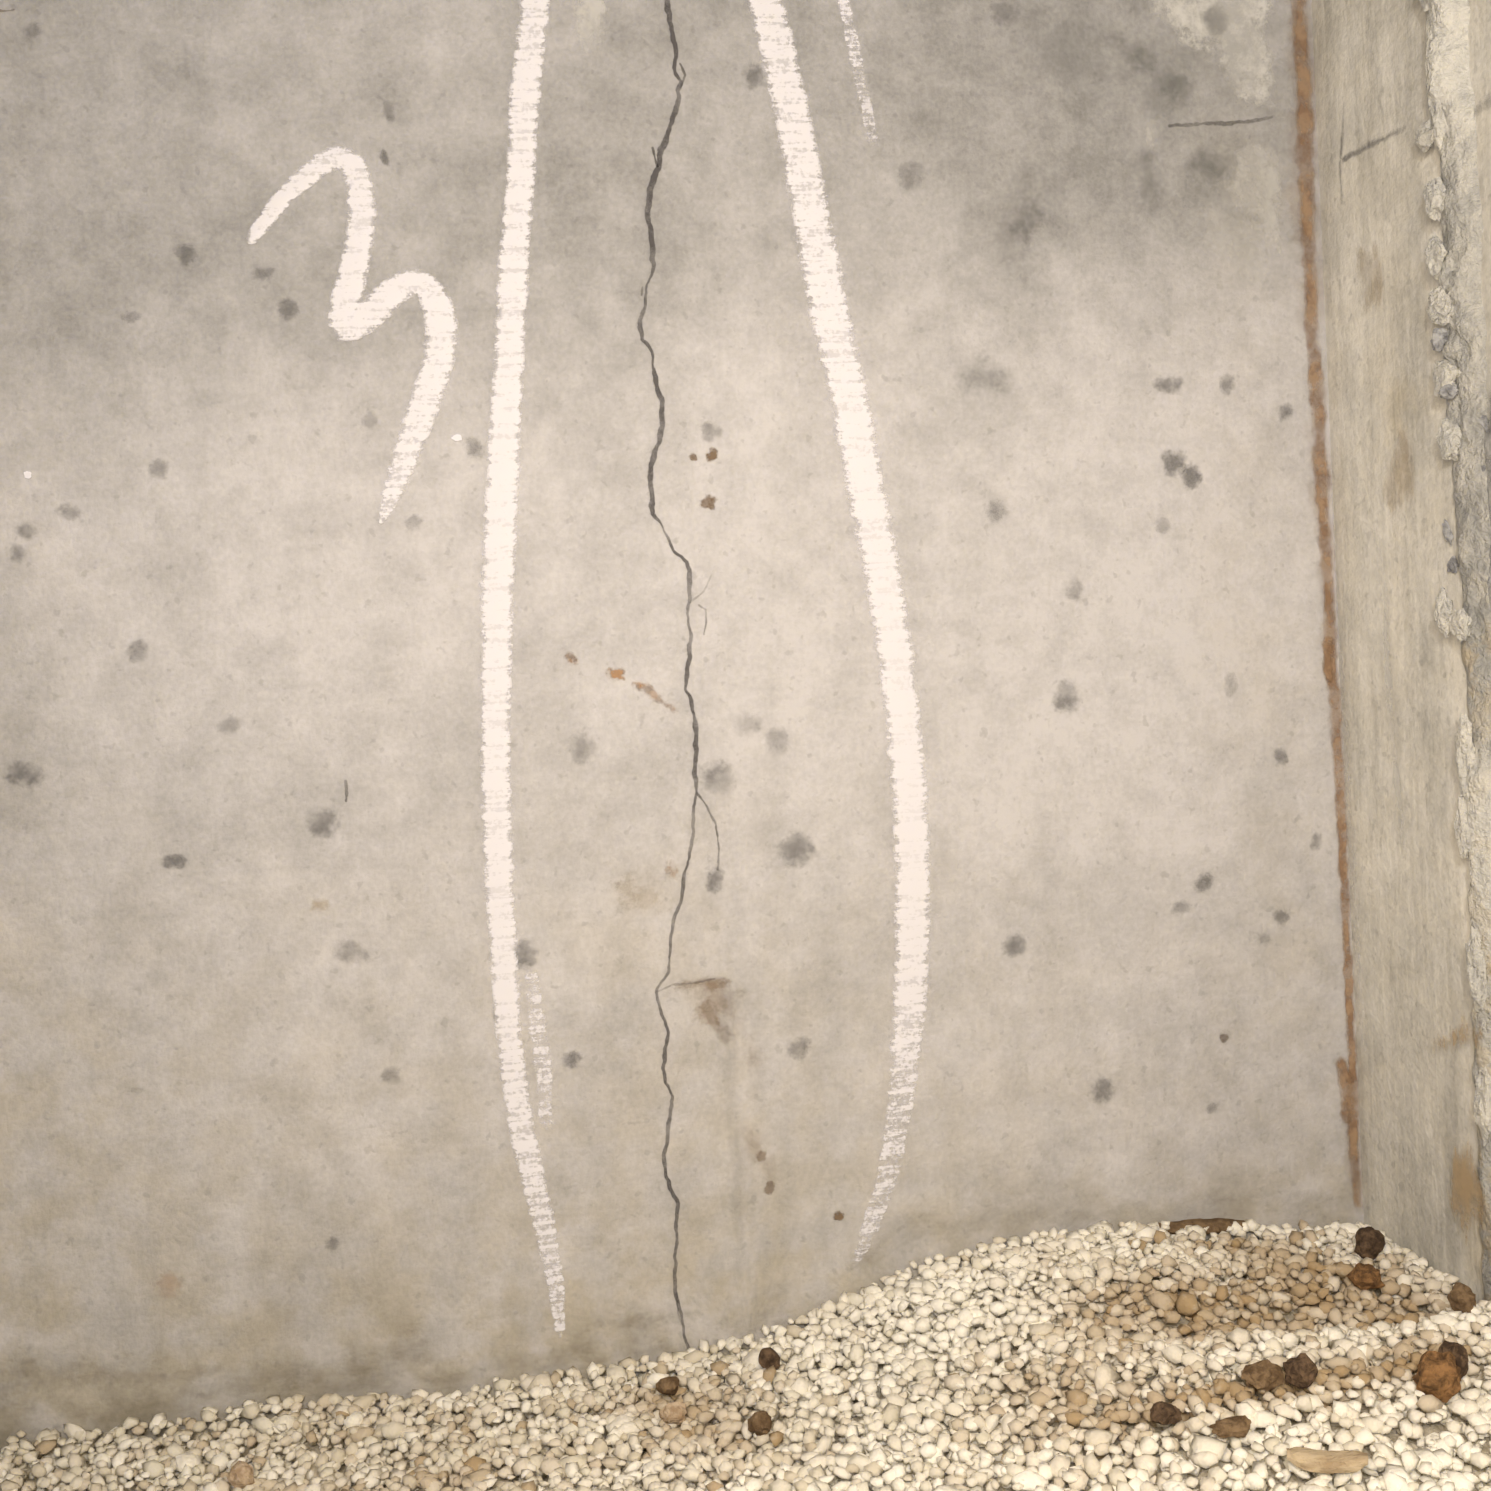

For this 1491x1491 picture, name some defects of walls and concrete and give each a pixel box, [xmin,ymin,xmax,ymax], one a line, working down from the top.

crack [638,0,692,583]
rust [1294,0,1358,1201]
spalling [1442,519,1459,573]
crack [655,621,718,1348]